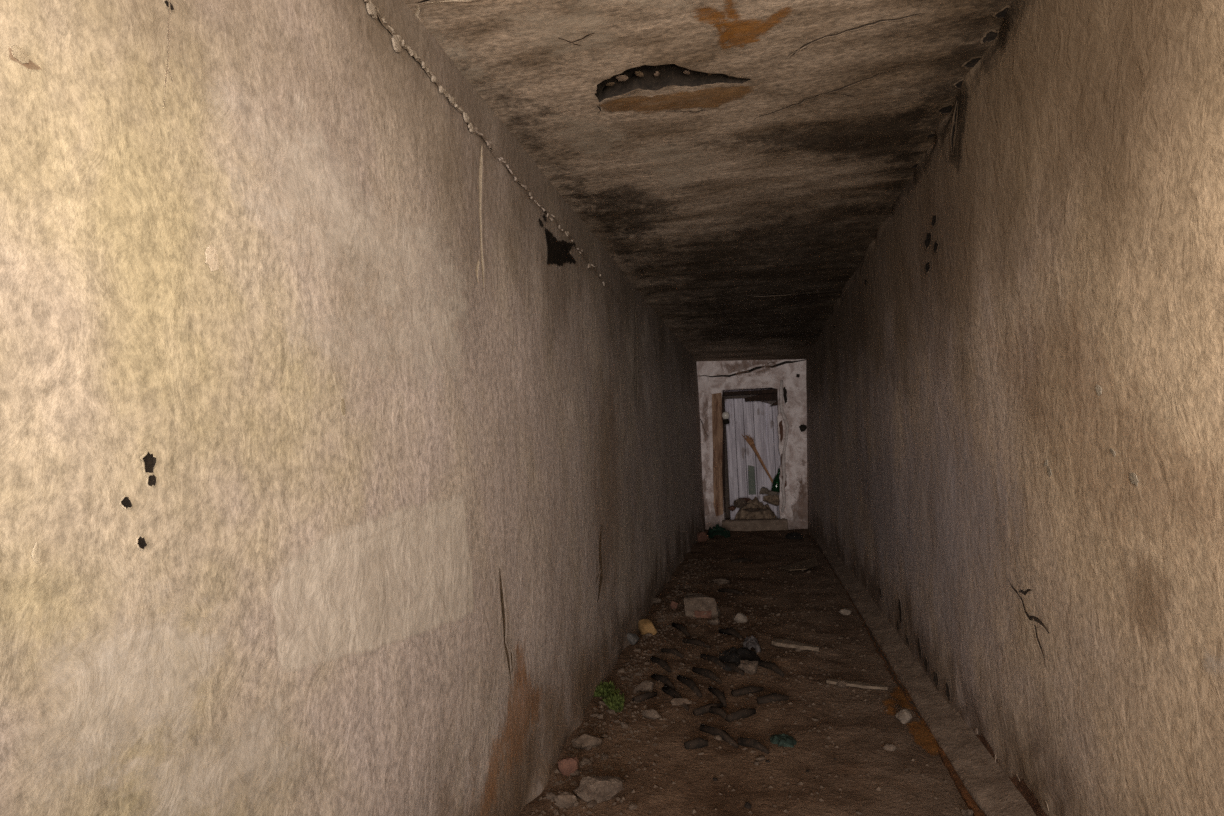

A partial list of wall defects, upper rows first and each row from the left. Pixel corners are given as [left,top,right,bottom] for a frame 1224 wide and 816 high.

spalling [364,0,605,286]
hole [579,54,767,108]
rust [696,0,790,48]
rust [883,687,984,816]